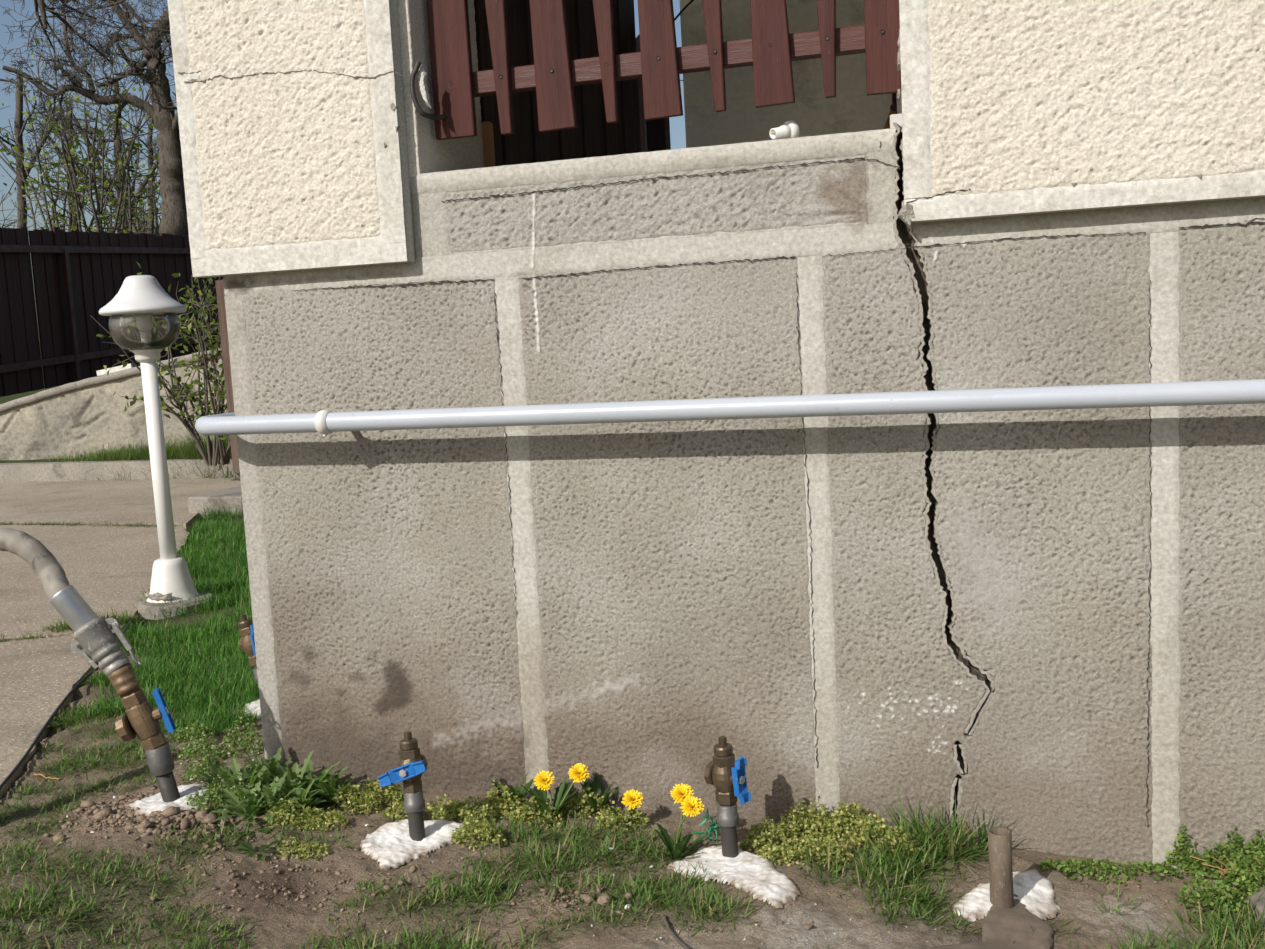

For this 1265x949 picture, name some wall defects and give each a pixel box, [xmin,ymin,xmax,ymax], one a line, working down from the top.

water stain [377,663,409,711]
crack [291,123,1146,828]
crack [1144,281,1152,827]
crack [1179,218,1265,229]